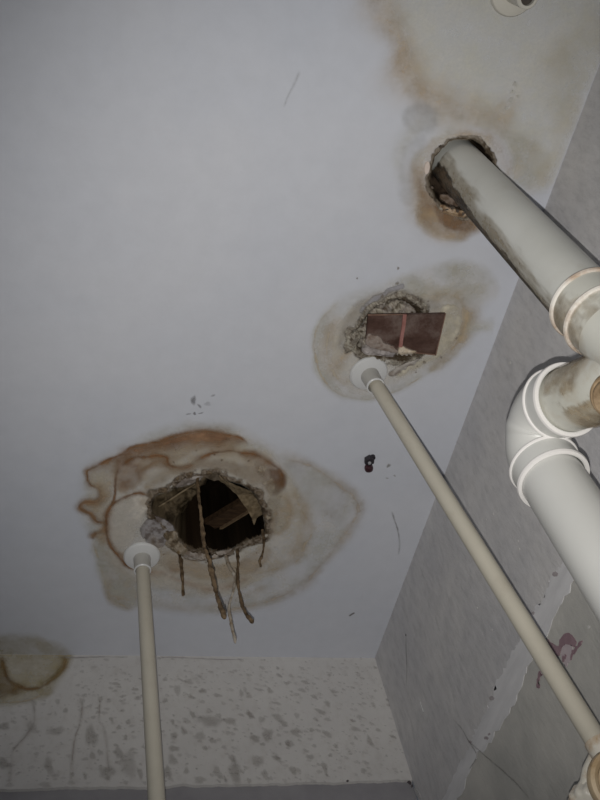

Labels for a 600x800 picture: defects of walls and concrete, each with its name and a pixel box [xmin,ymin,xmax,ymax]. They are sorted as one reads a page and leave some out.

hole [424,135,500,220]
spalling [344,284,429,376]
water stain [419,293,473,357]
rust [78,431,298,572]
hole [140,468,272,561]
water stain [0,654,70,703]